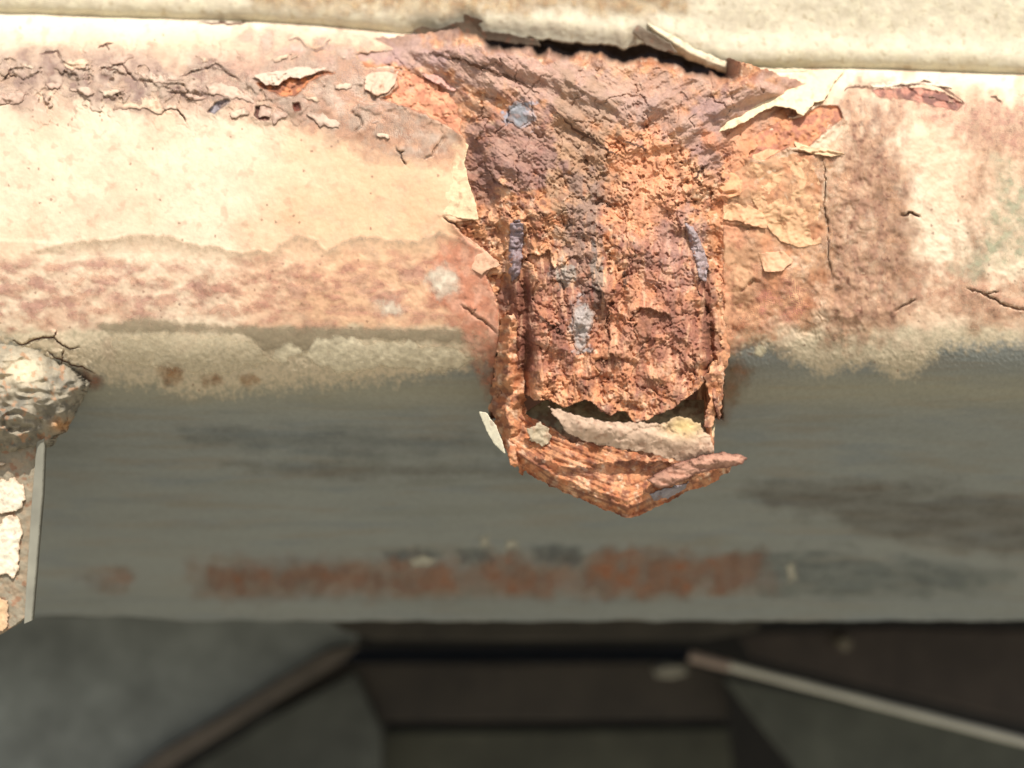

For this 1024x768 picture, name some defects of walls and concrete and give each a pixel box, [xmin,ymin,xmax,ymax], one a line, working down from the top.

peeling [413,13,540,47]
peeling [632,23,727,74]
crack [13,332,93,373]
peeling [0,52,479,220]
corrosion [0,227,502,384]
peeling [467,237,501,275]
peeling [719,67,845,272]
crack [794,151,845,276]
corrosion [714,86,1024,342]
crack [967,288,1021,310]
peeling [527,422,552,447]
peeling [0,477,26,579]